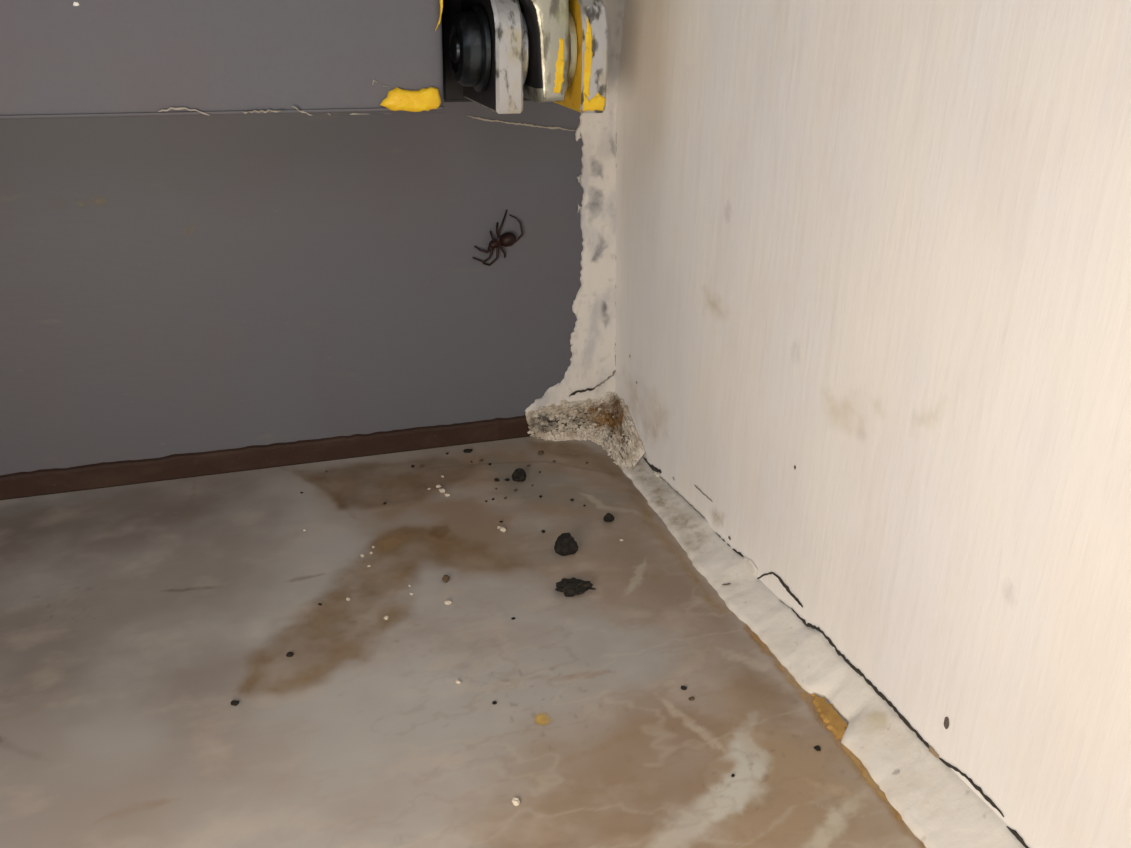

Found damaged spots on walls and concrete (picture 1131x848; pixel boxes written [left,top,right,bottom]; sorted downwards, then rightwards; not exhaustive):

peeling [525,0,645,471]
crack [642,456,1029,848]